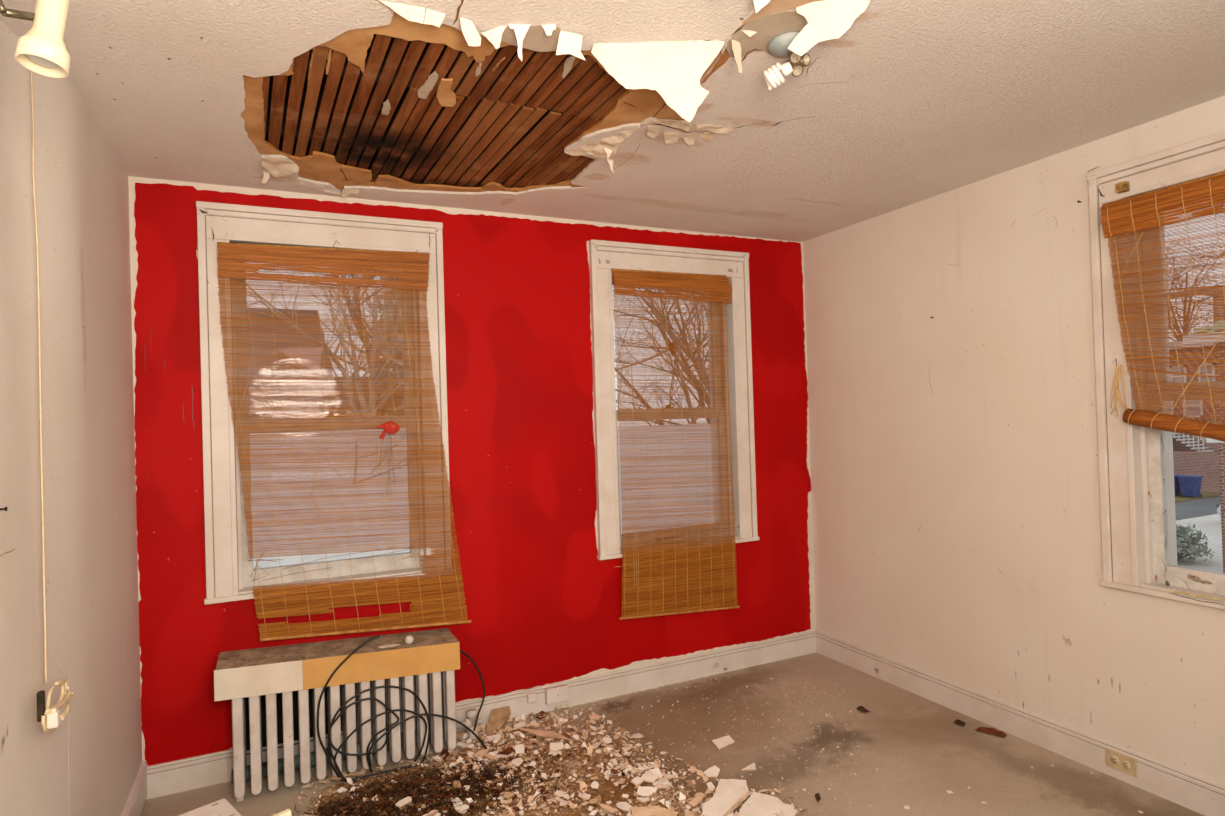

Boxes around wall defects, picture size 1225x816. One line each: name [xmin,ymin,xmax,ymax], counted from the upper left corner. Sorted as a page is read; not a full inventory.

flaking render [379,0,445,27]
flaking render [460,0,870,174]
flaking render [261,158,342,196]